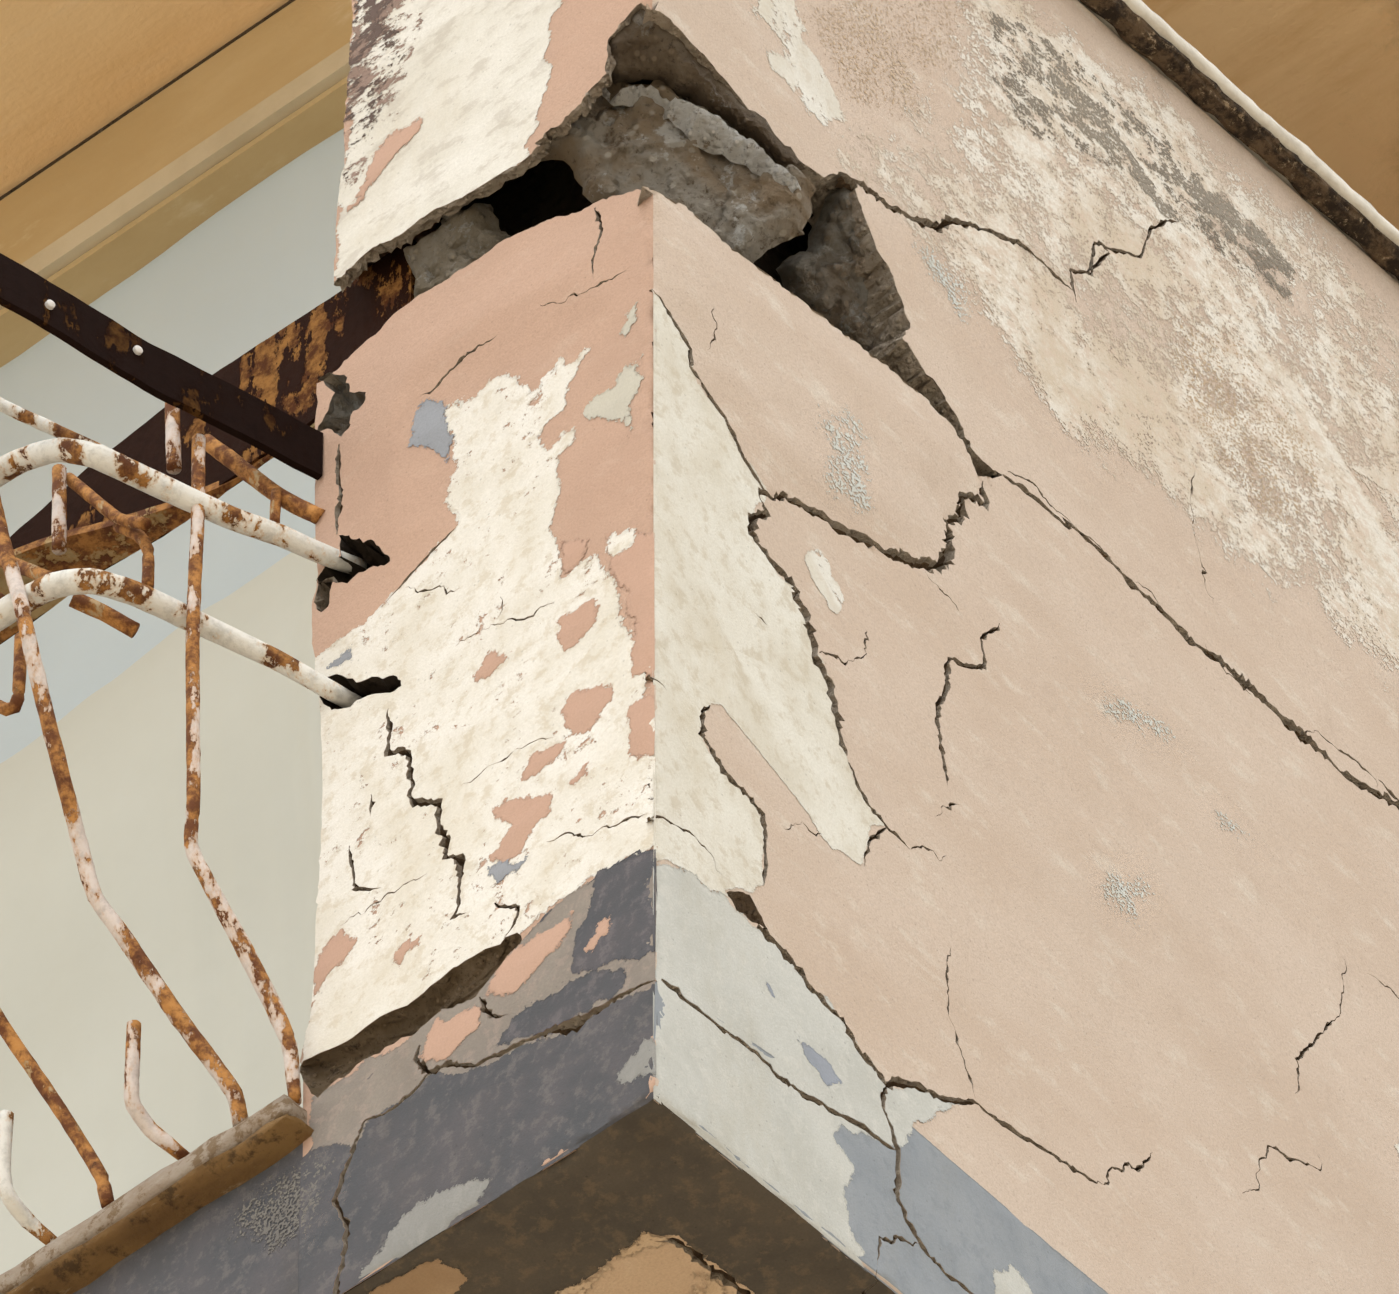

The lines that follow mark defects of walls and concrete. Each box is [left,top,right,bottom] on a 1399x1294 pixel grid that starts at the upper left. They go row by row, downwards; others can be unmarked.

peeling [334,0,1399,691]
crack [835,174,1176,302]
damp [988,11,1303,305]
damp [1168,315,1325,538]
crack [541,208,1399,886]
crack [349,711,546,941]
peeling [300,291,954,1268]
crack [332,924,1151,1294]
crack [1295,959,1399,1094]
peeling [358,1177,489,1294]
peeling [555,1231,671,1294]
peeling [691,1272,726,1294]